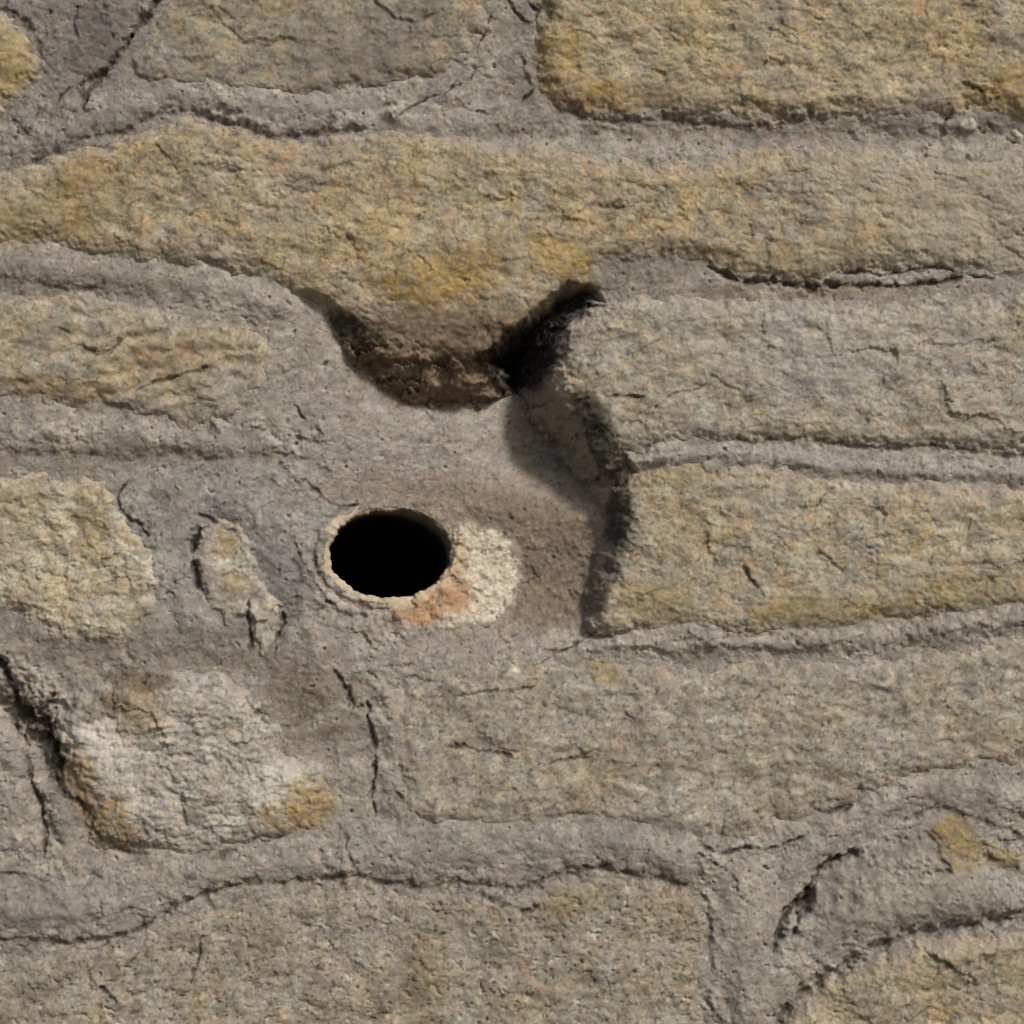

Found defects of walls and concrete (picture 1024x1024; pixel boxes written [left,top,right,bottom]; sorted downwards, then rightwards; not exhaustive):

leakage [477,295,589,393]
leakage [605,478,633,553]
crack [0,658,149,884]
crack [333,668,404,817]
crack [773,850,862,952]